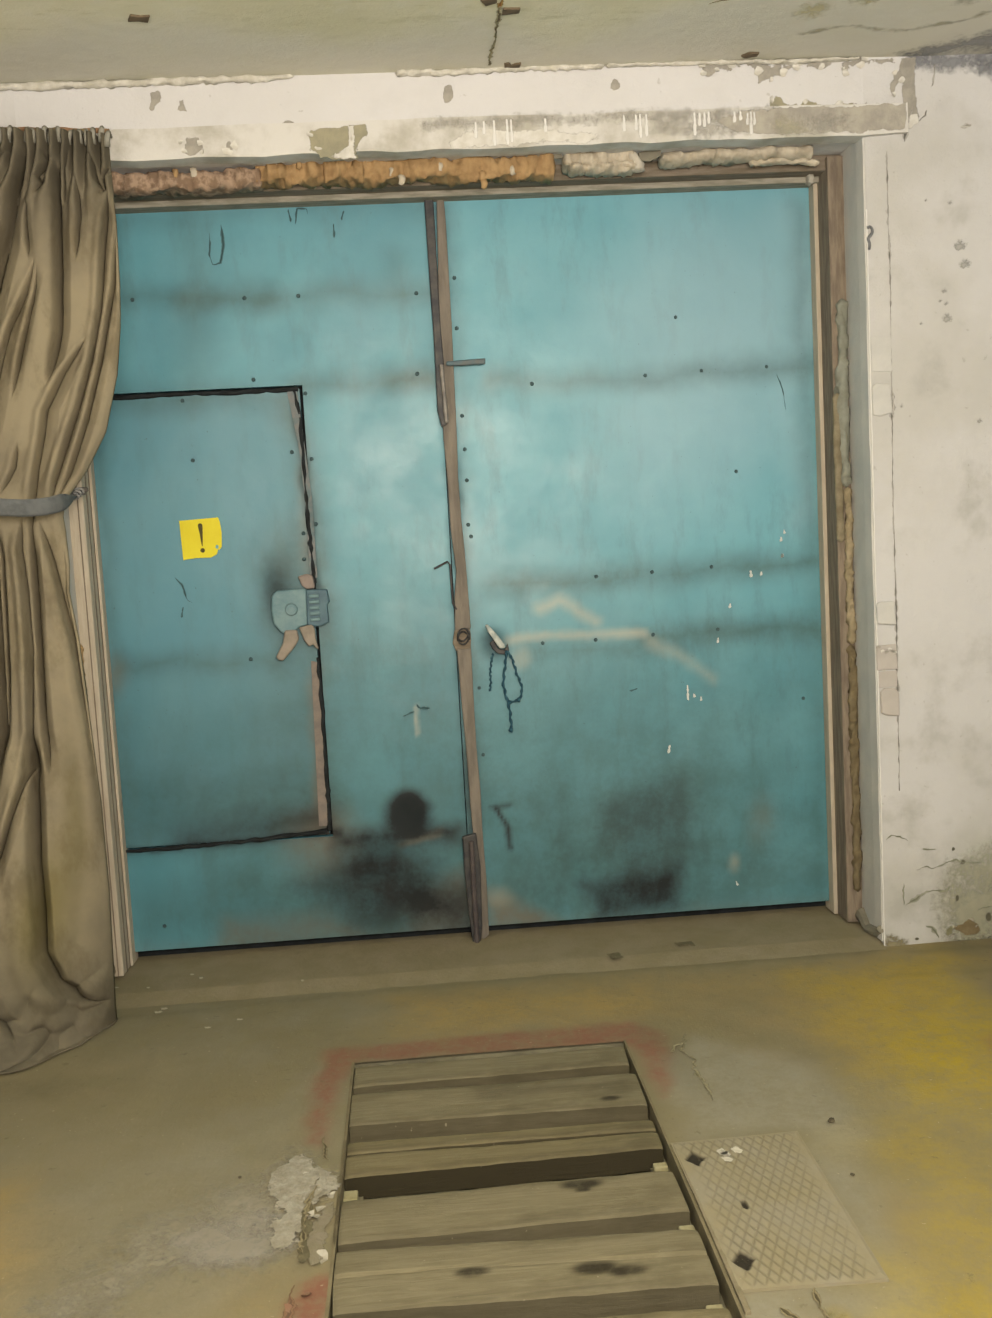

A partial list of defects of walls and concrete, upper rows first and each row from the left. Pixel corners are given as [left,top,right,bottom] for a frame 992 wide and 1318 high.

corrosion [488,0,504,66]
peeling [178,137,204,156]
peeling [307,124,368,161]
damp [944,854,992,941]
damp [885,935,907,947]
spalling [355,1041,624,1069]
spalling [358,1156,670,1200]
spalling [297,1137,346,1265]